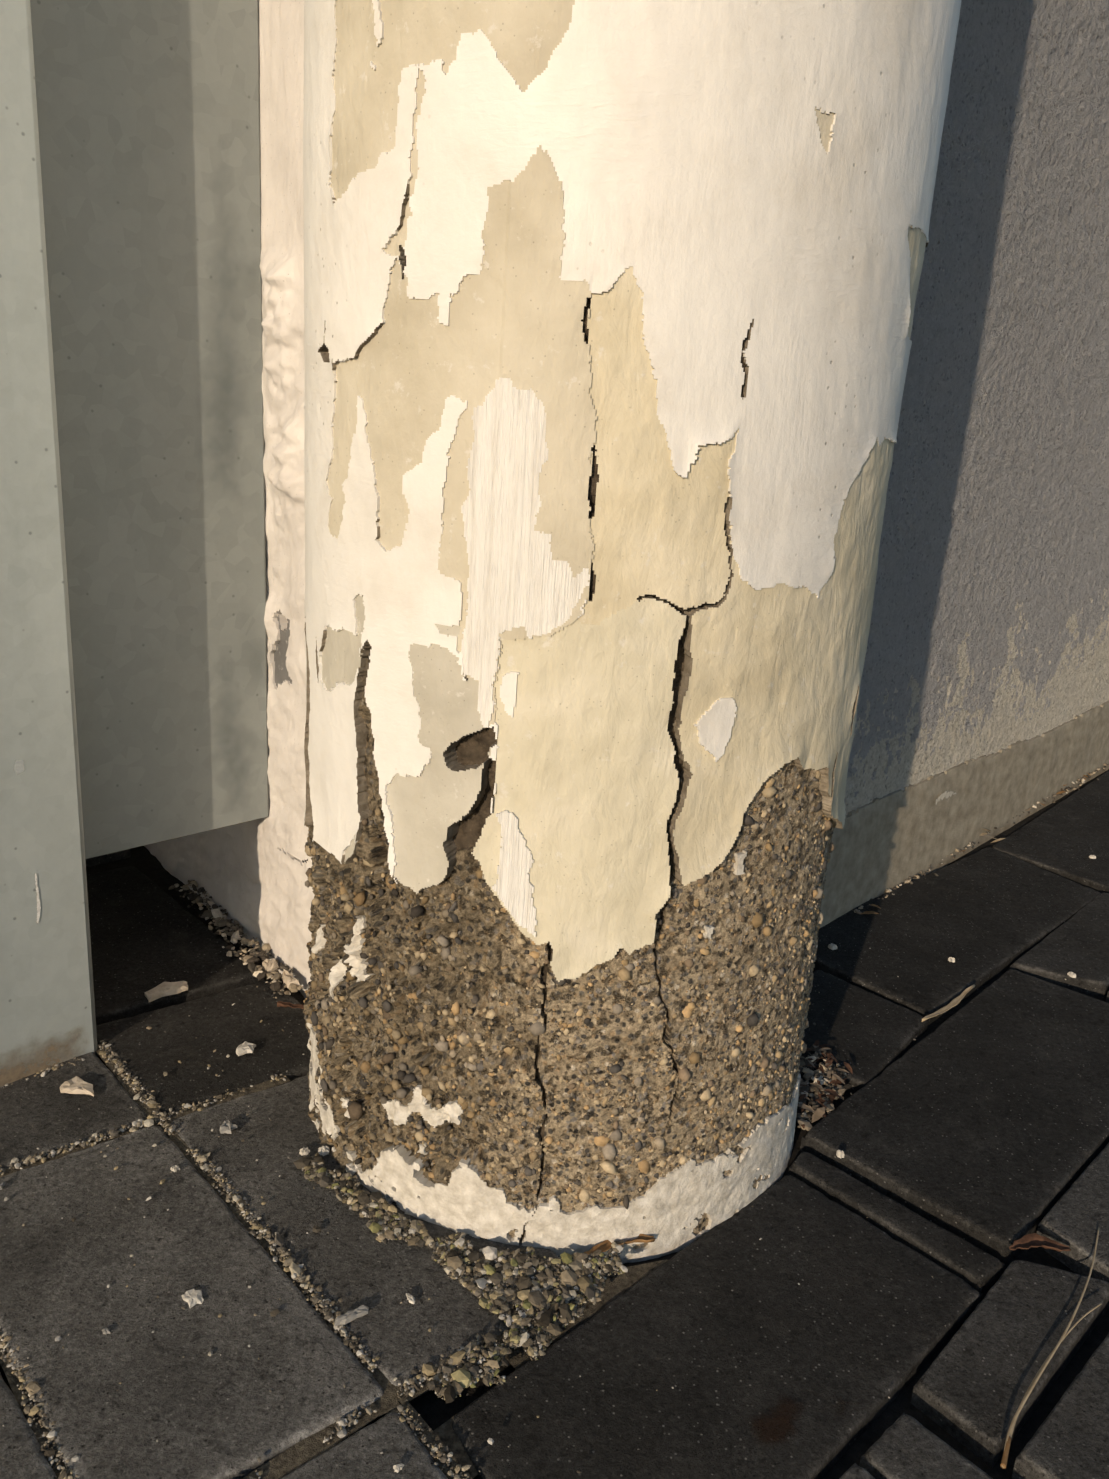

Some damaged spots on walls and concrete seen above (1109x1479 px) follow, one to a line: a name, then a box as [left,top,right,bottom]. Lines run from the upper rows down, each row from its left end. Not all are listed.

crack [582,298,591,344]
crack [588,562,596,600]
crack [588,445,599,518]
spalling [262,0,1109,1264]
crack [645,594,686,1111]
crack [521,941,553,1237]